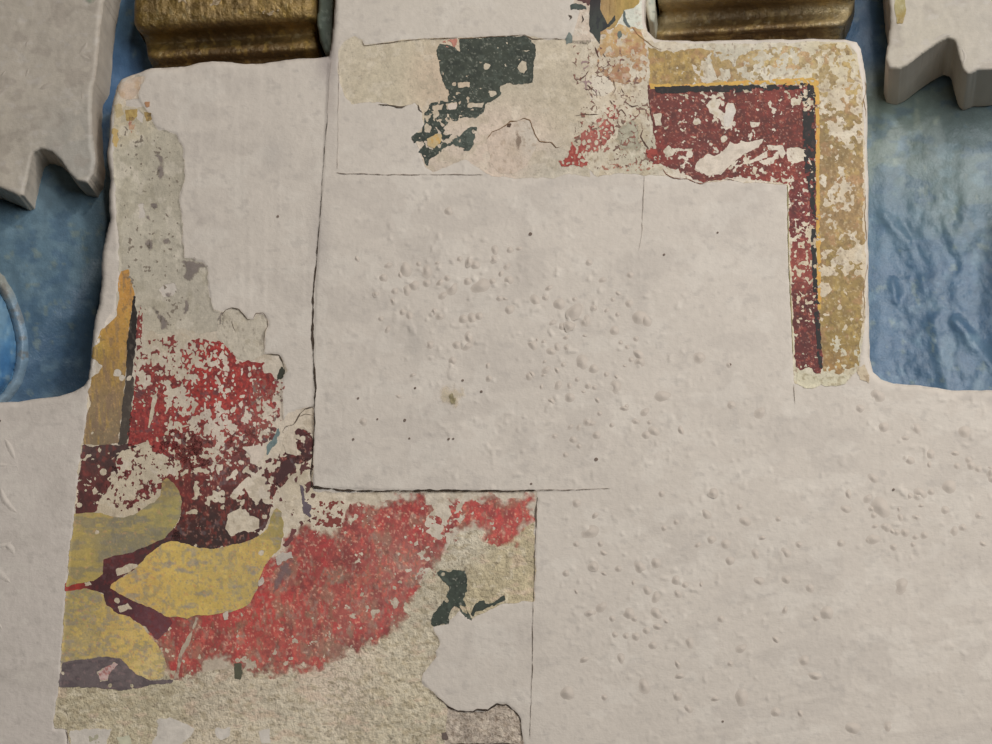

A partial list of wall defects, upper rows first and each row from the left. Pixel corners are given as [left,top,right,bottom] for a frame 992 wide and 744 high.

peeling [53,75,537,744]
crack [310,60,610,725]
peeling [338,0,869,388]